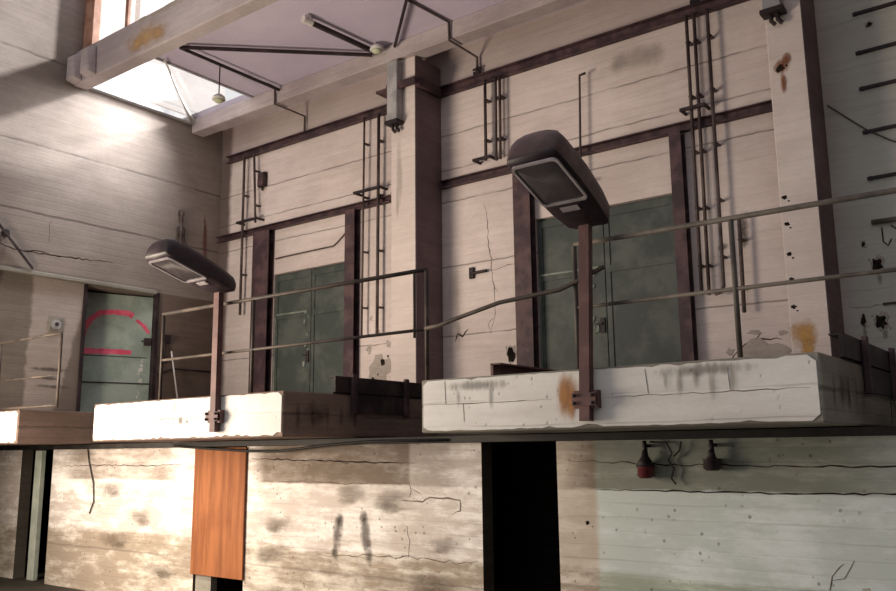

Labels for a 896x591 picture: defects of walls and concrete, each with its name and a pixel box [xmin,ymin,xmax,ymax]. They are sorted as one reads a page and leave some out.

corrosion [776,54,790,90]
crack [1,221,111,263]
crack [455,206,511,342]
peeling [366,330,391,380]
spalling [726,330,792,357]
corrosion [794,325,815,353]
corrosion [560,382,574,414]
crack [567,460,896,468]
crack [613,488,896,496]